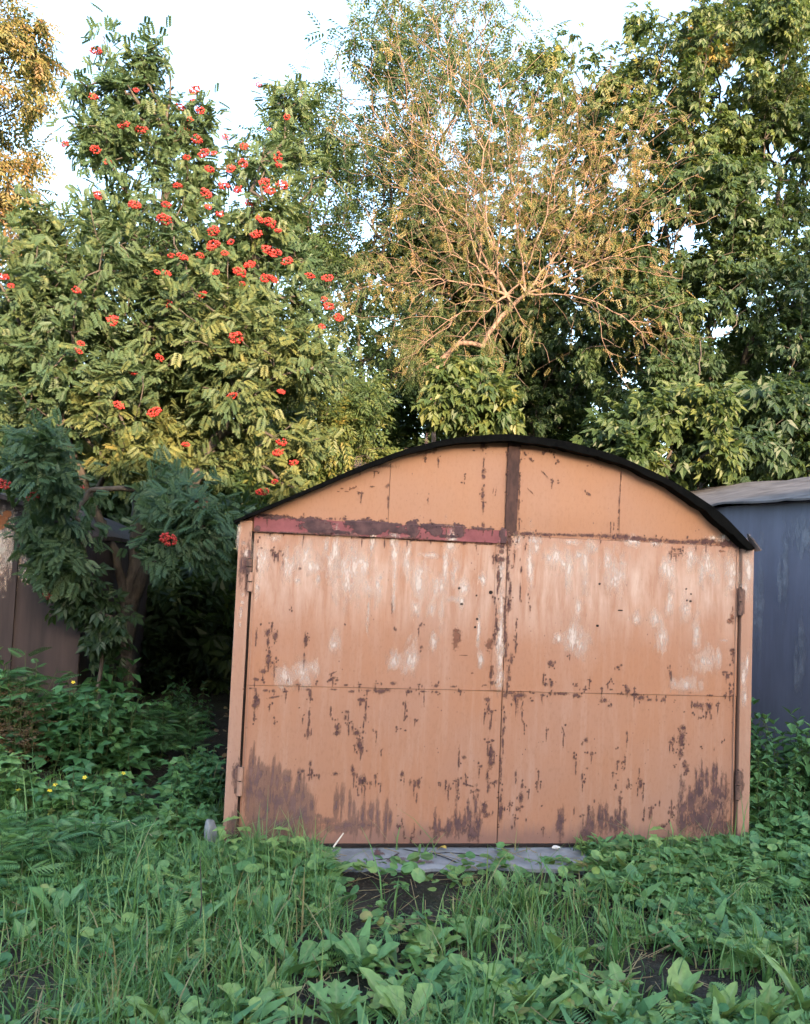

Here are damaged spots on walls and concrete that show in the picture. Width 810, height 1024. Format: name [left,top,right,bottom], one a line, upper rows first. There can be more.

leakage [303,544,366,586]
corrosion [226,445,738,848]